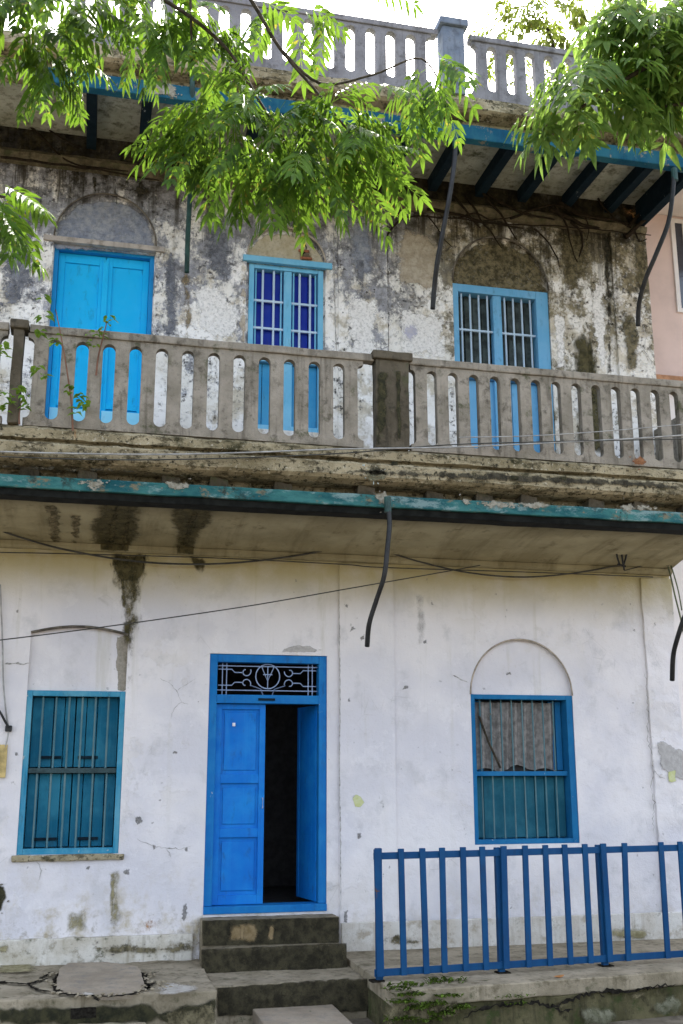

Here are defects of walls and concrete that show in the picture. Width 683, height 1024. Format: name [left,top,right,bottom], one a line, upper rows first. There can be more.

leakage [0,193,39,307]
leakage [156,253,202,335]
leakage [452,233,612,325]
leakage [572,334,611,373]
leakage [591,388,600,452]
peeling [78,479,110,492]
peeling [161,478,201,490]
spalling [362,461,398,513]
leakage [347,469,679,489]
leakage [171,509,211,570]
leakage [45,505,146,648]
flaking render [654,738,683,780]